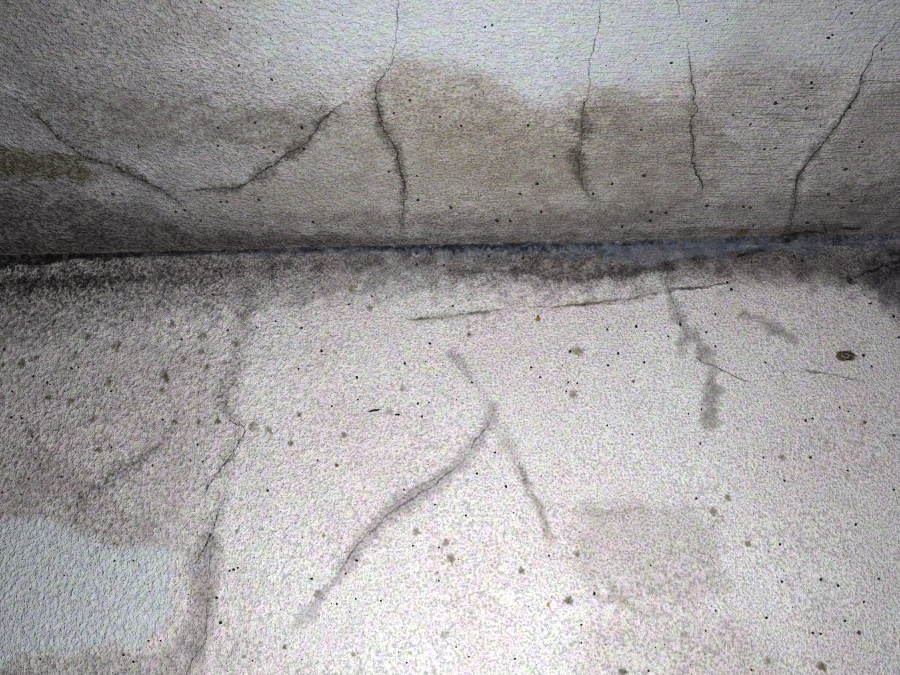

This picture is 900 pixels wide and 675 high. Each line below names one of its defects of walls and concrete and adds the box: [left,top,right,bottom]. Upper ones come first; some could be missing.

crack [27,106,333,201]
crack [375,71,405,215]
crack [570,102,591,180]
crack [689,61,703,186]
crack [795,23,896,203]
water stain [0,195,677,336]
water stain [684,225,900,303]